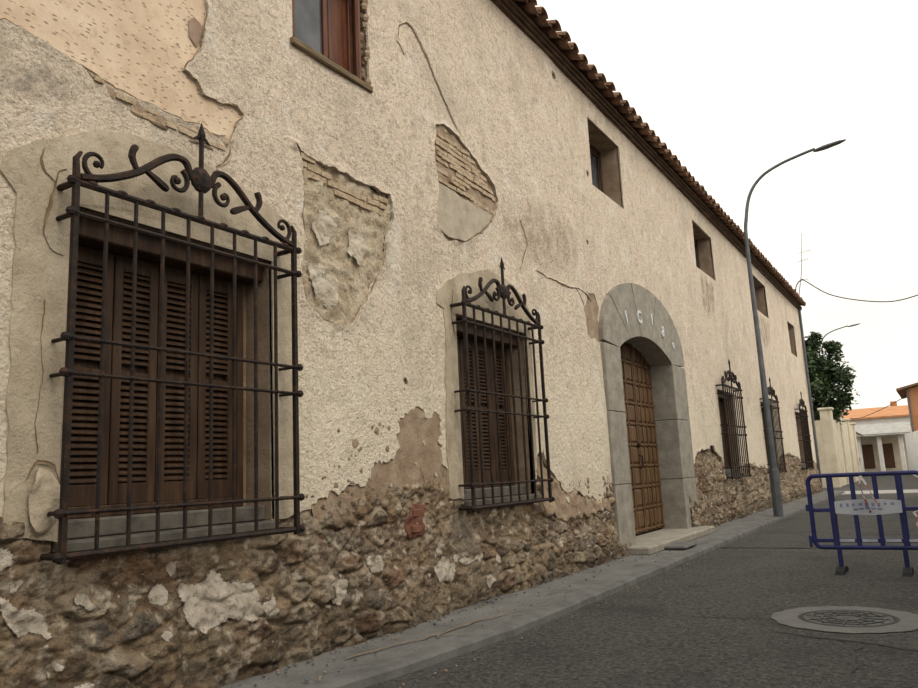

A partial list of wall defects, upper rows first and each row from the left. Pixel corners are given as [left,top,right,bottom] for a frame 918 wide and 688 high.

flaking render [0,0,244,167]
crack [396,21,461,136]
flaking render [300,150,393,329]
flaking render [435,124,498,243]
peeling [309,407,462,539]
peeling [536,456,615,522]
peeling [148,584,168,606]
peeling [263,597,276,616]